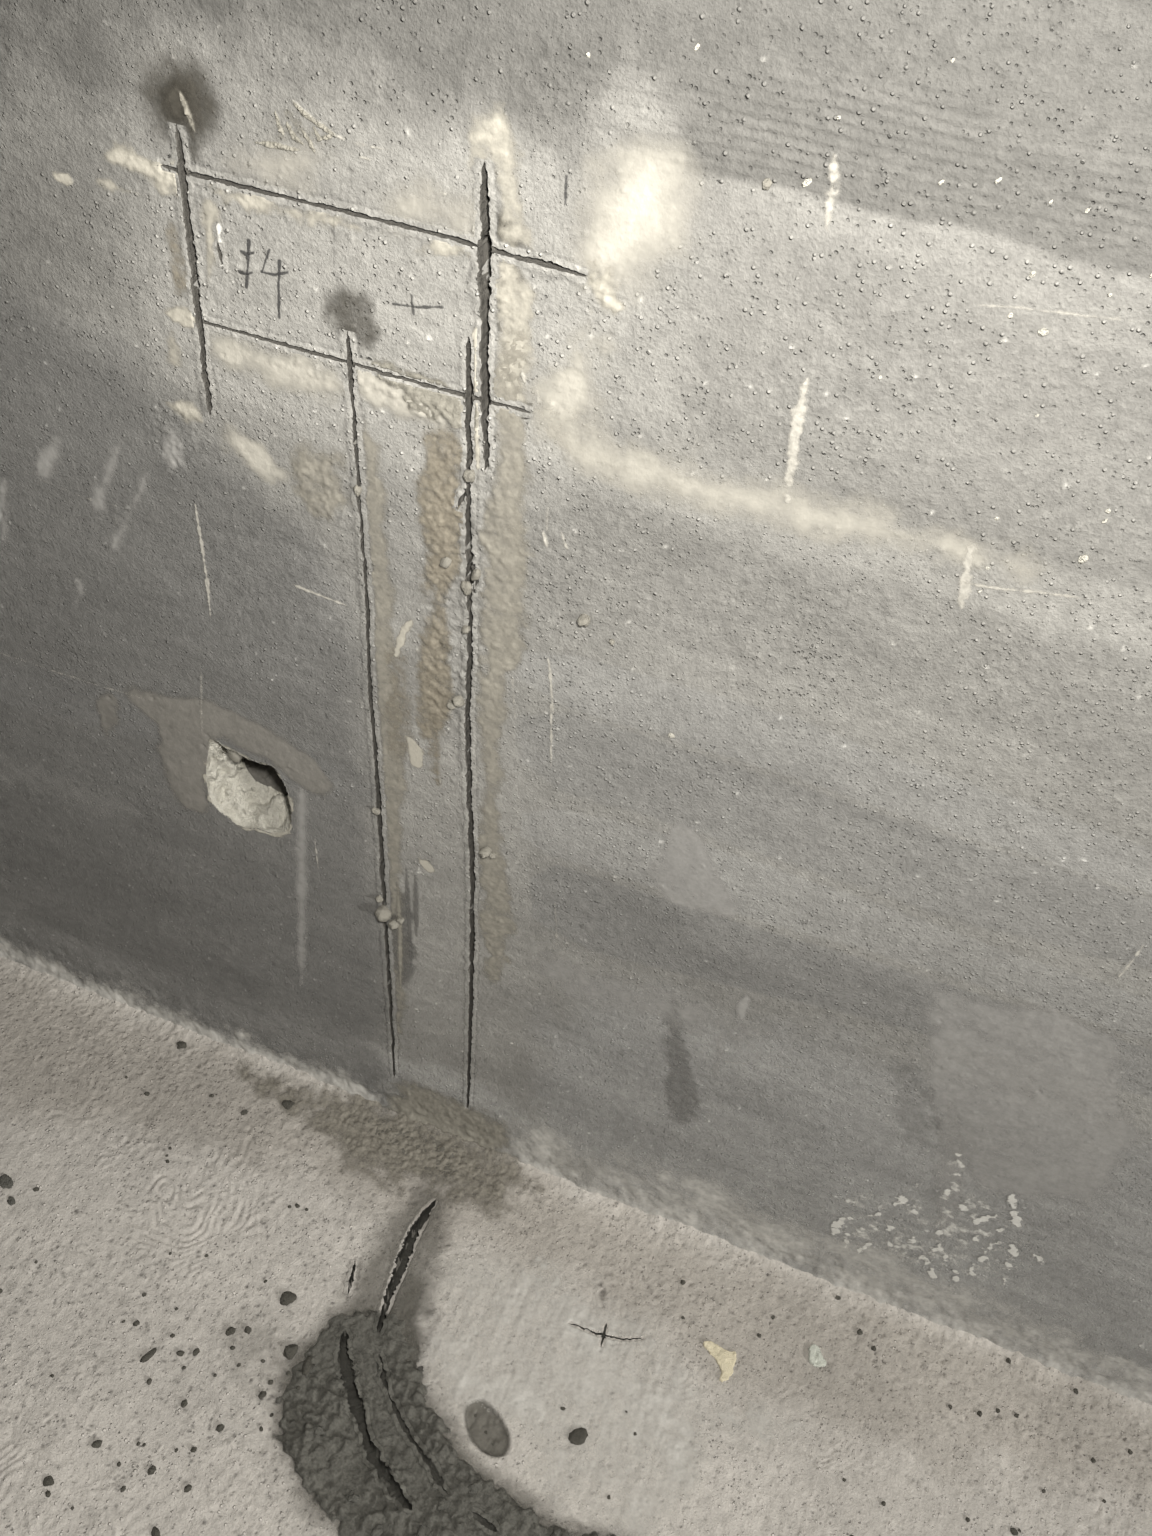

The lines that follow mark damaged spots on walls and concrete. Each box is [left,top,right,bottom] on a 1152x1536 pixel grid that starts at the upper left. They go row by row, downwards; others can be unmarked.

crack [157,122,589,1110]
spalling [202,739,294,837]
crack [332,1196,538,1536]
crack [568,1319,646,1348]
leakage [511,1128,1152,1404]